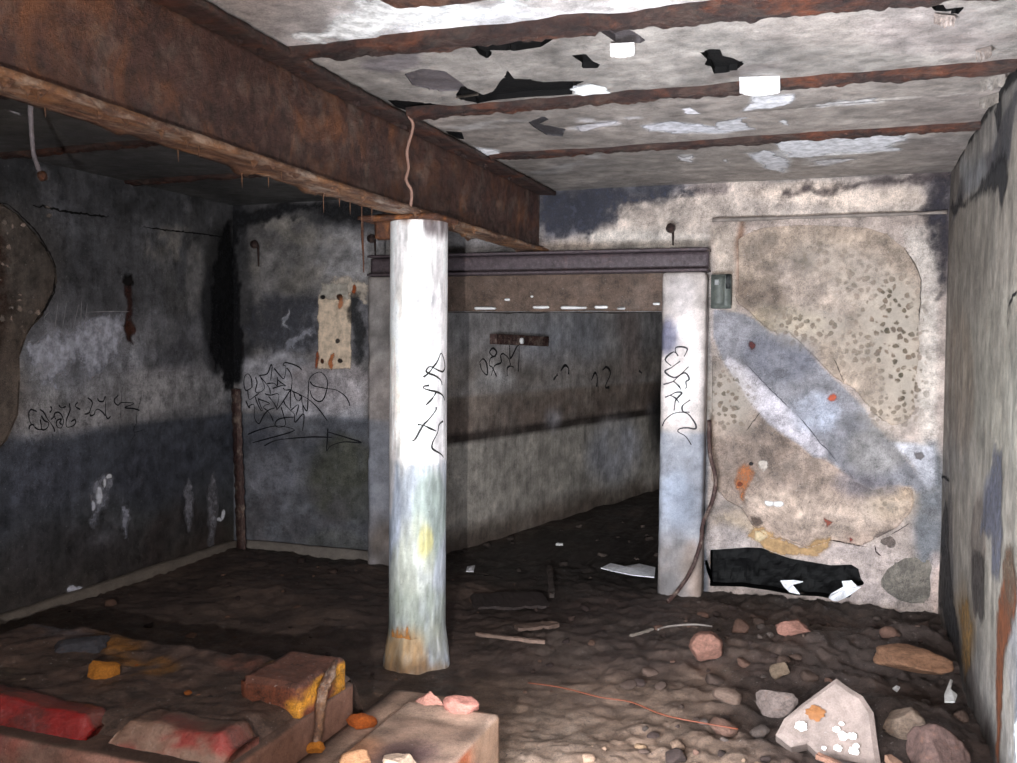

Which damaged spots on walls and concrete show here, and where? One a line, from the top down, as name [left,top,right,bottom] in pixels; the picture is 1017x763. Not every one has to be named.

peeling [405,69,610,106]
peeling [643,49,794,133]
leakage [875,70,1017,183]
crack [0,203,108,323]
rust [122,274,136,344]
crack [146,227,222,238]
flaking render [315,282,356,369]
spalling [735,225,921,425]
leakage [951,154,1008,214]
spalling [710,355,914,598]
leakage [938,502,959,652]
leakage [971,450,1002,622]